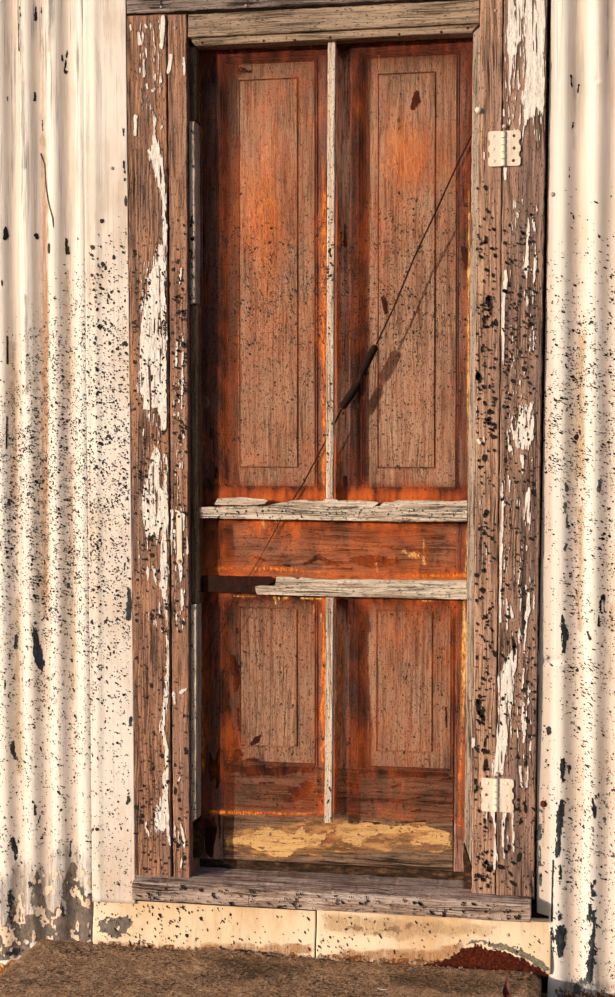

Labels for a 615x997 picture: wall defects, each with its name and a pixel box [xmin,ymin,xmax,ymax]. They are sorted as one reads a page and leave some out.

peeling [503,0,546,155]
peeling [501,199,538,475]
peeling [122,15,189,869]
peeling [492,475,551,788]
peeling [560,614,569,654]
peeling [204,609,452,858]
peeling [560,758,571,783]
peeling [0,837,133,961]
peeling [485,811,515,870]
peeling [555,799,565,880]
rust [555,989,615,997]
peeling [573,879,598,994]